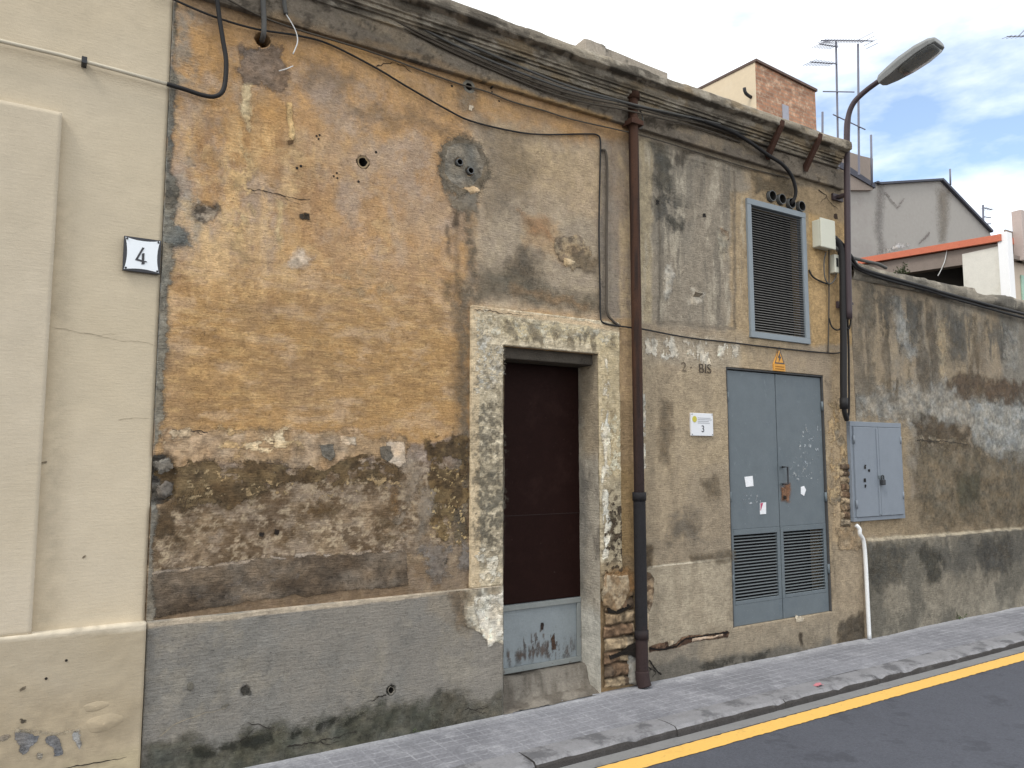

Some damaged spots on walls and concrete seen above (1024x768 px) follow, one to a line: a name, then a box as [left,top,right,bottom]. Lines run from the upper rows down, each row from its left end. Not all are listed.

crack [246,188,311,205]
leakage [652,144,685,229]
leakage [859,286,1024,405]
flaking render [151,425,411,543]
leakage [915,416,1024,576]
flaking render [424,434,504,647]
flaking render [600,409,637,688]
leakage [867,543,945,588]
corrosion [507,623,571,660]
crack [648,631,730,676]
peeling [0,719,82,759]
leakage [143,690,503,768]